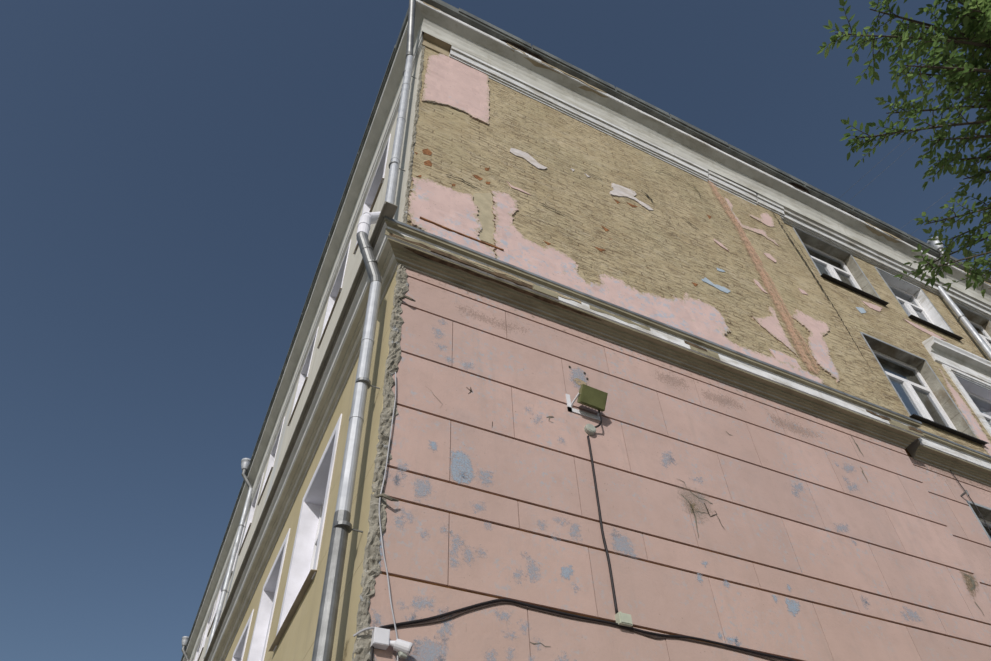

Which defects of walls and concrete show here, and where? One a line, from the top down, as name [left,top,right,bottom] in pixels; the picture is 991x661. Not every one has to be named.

spalling [385,40,991,456]
spalling [352,264,412,661]
crack [679,479,724,538]